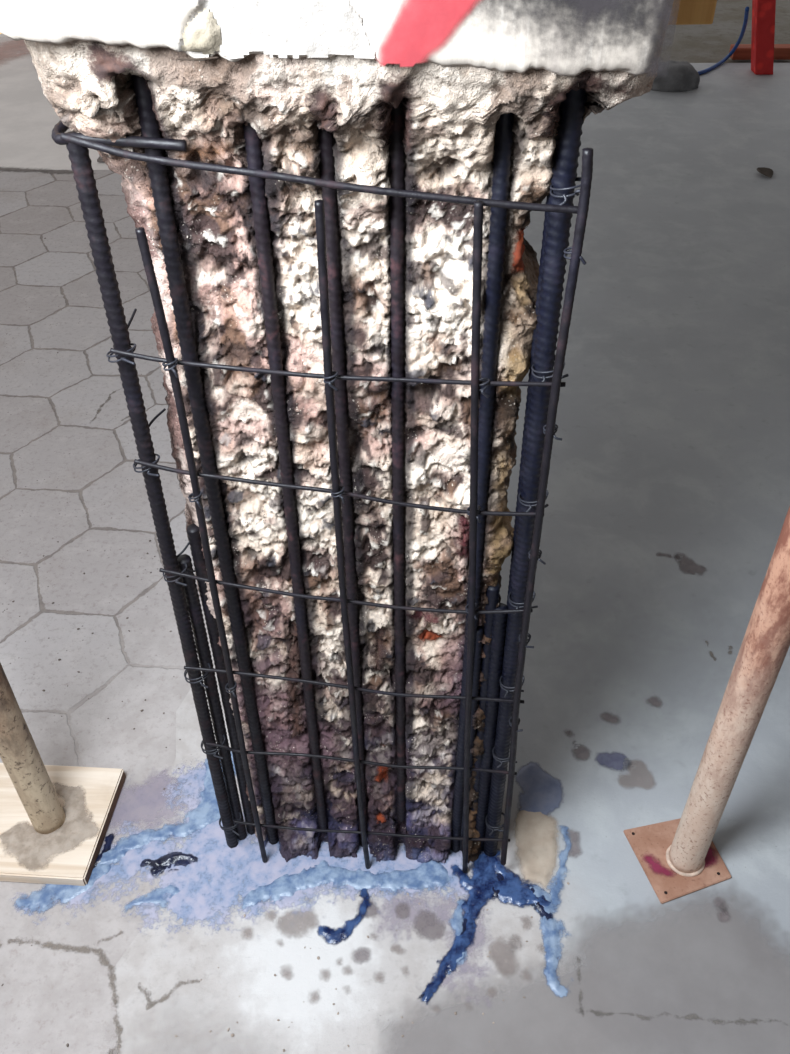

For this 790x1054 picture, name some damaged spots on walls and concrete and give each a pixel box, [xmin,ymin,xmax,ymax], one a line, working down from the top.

spalling [24,0,657,864]
damp [657,553,705,575]
damp [567,731,654,788]
damp [268,912,315,934]
crack [0,932,200,1054]
damp [354,949,369,962]
damp [391,898,790,1054]
crack [577,958,649,1020]
crack [685,1014,771,1024]